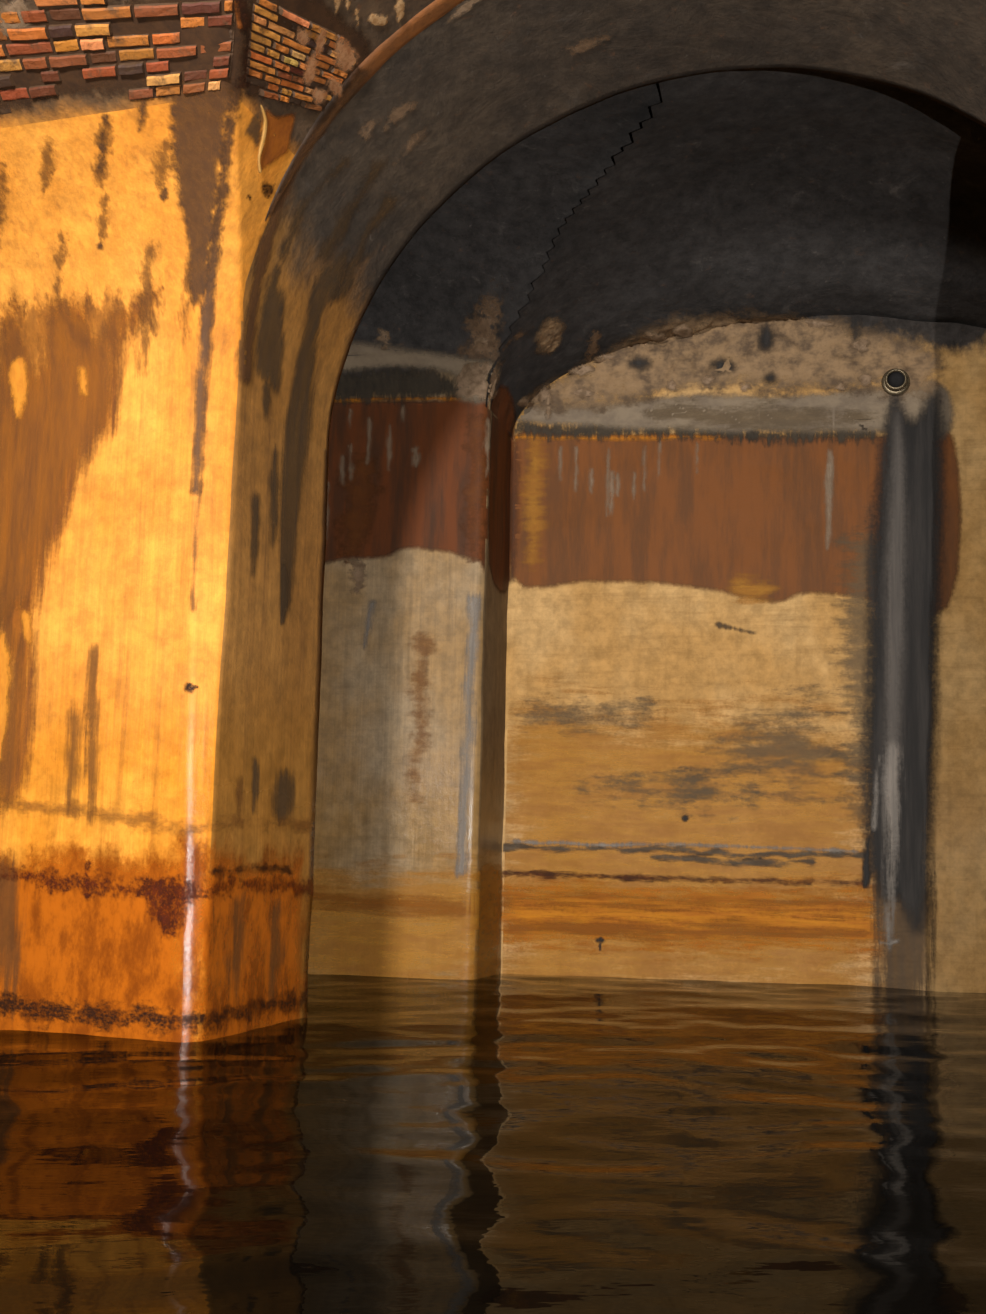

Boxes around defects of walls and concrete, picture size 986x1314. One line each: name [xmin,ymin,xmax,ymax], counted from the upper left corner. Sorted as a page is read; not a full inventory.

water stain [40,142,55,189]
water stain [94,114,112,181]
flaking render [0,0,373,200]
crack [232,0,252,88]
water stain [334,0,405,27]
water stain [156,73,242,494]
water stain [239,27,397,624]
water stain [0,234,158,819]
corrosion [325,386,886,603]
corrosion [936,431,961,612]
water stain [502,381,953,991]
corrosion [0,833,887,1042]